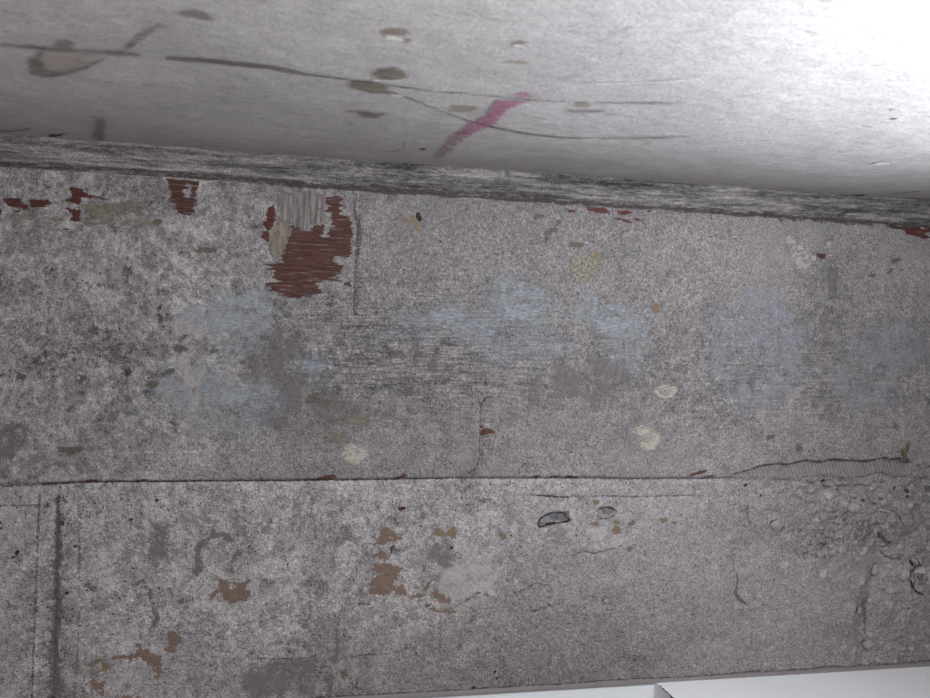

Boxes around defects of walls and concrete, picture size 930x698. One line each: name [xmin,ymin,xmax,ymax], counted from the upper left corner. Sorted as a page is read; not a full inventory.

peeling [0,198,52,222]
peeling [64,187,109,230]
peeling [260,189,361,298]
crack [0,396,715,698]
crack [878,509,904,559]
crack [861,593,869,633]
crack [312,660,930,698]